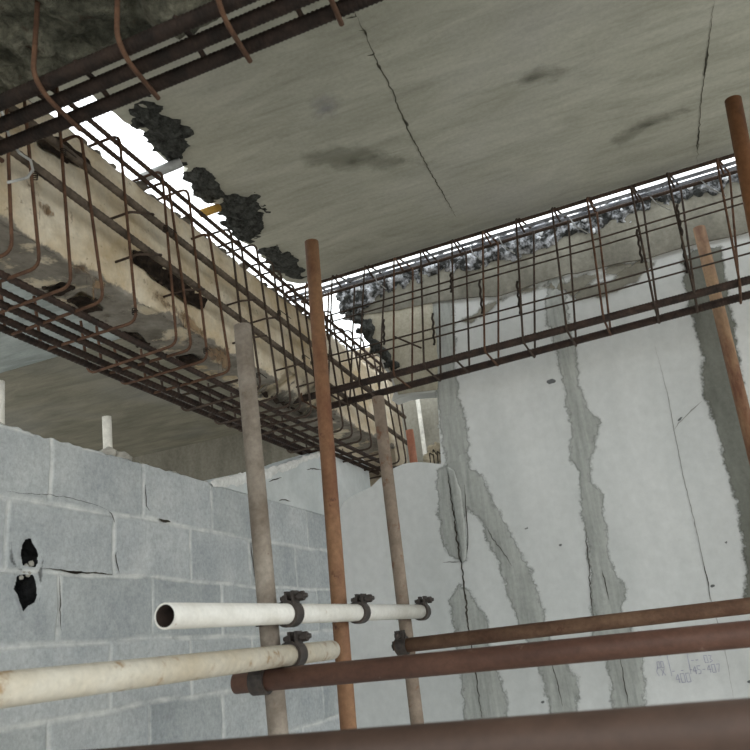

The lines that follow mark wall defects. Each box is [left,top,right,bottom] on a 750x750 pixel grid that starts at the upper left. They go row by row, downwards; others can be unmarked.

spalling [38,136,91,167]
spalling [128,96,307,279]
crack [346,14,452,209]
crack [696,7,714,159]
spalling [42,282,103,314]
spalling [132,250,208,309]
spalling [175,354,202,364]
spalling [335,168,739,371]
spalling [14,538,38,611]
crack [443,476,472,648]
crack [656,352,718,623]